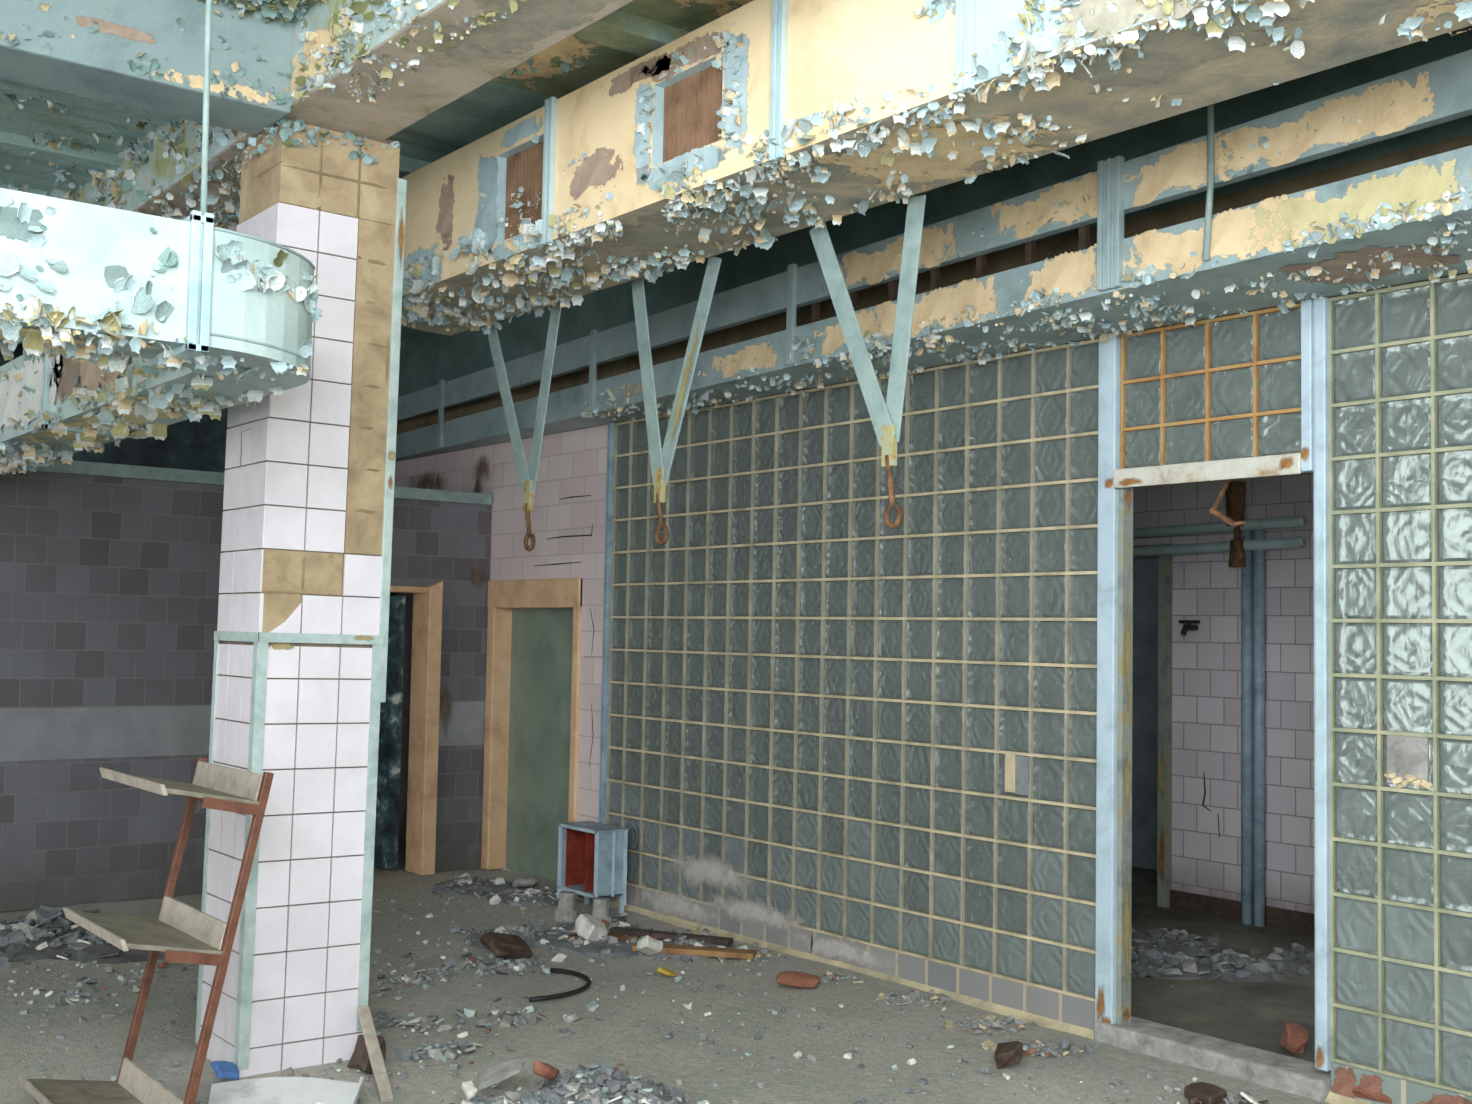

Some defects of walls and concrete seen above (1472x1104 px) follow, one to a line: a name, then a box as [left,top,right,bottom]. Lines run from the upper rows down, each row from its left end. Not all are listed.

peeling [1379,0,1472,42]
peeling [1123,70,1469,207]
peeling [0,0,1315,632]
peeling [856,153,1472,379]
water stain [642,857,881,968]
spalling [1332,1066,1392,1104]
spalling [1415,1093,1472,1104]